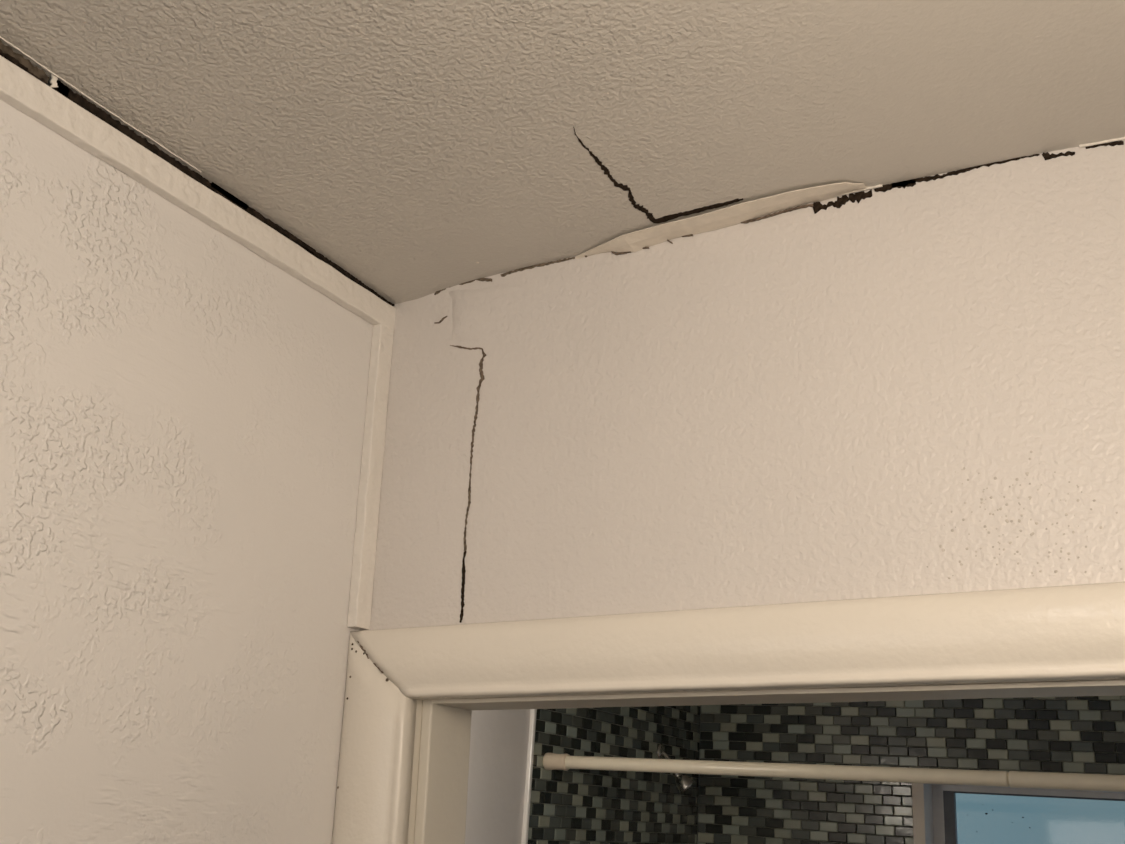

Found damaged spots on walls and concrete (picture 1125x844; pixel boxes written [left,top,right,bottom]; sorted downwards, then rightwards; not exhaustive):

crack [0,36,395,306]
crack [434,127,814,623]